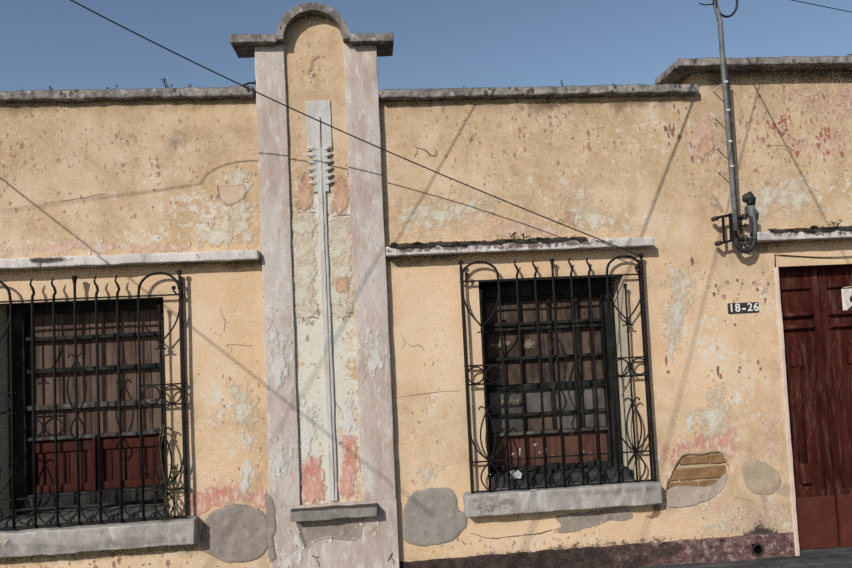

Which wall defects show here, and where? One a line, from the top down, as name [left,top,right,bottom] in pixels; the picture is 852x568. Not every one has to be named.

peeling [394,187,561,240]
peeling [562,182,651,238]
peeling [188,164,354,516]
peeling [337,390,361,500]
flaking render [651,365,740,512]